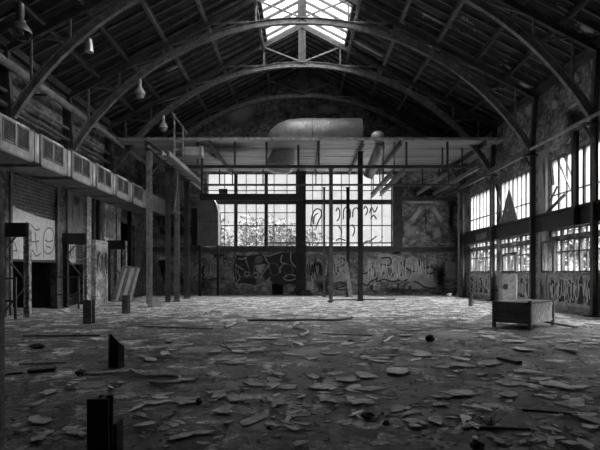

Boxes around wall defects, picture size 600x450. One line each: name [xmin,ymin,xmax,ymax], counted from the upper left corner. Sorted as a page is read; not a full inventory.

peeling [24,375,128,407]
peeling [114,326,600,450]
peeling [14,415,87,450]